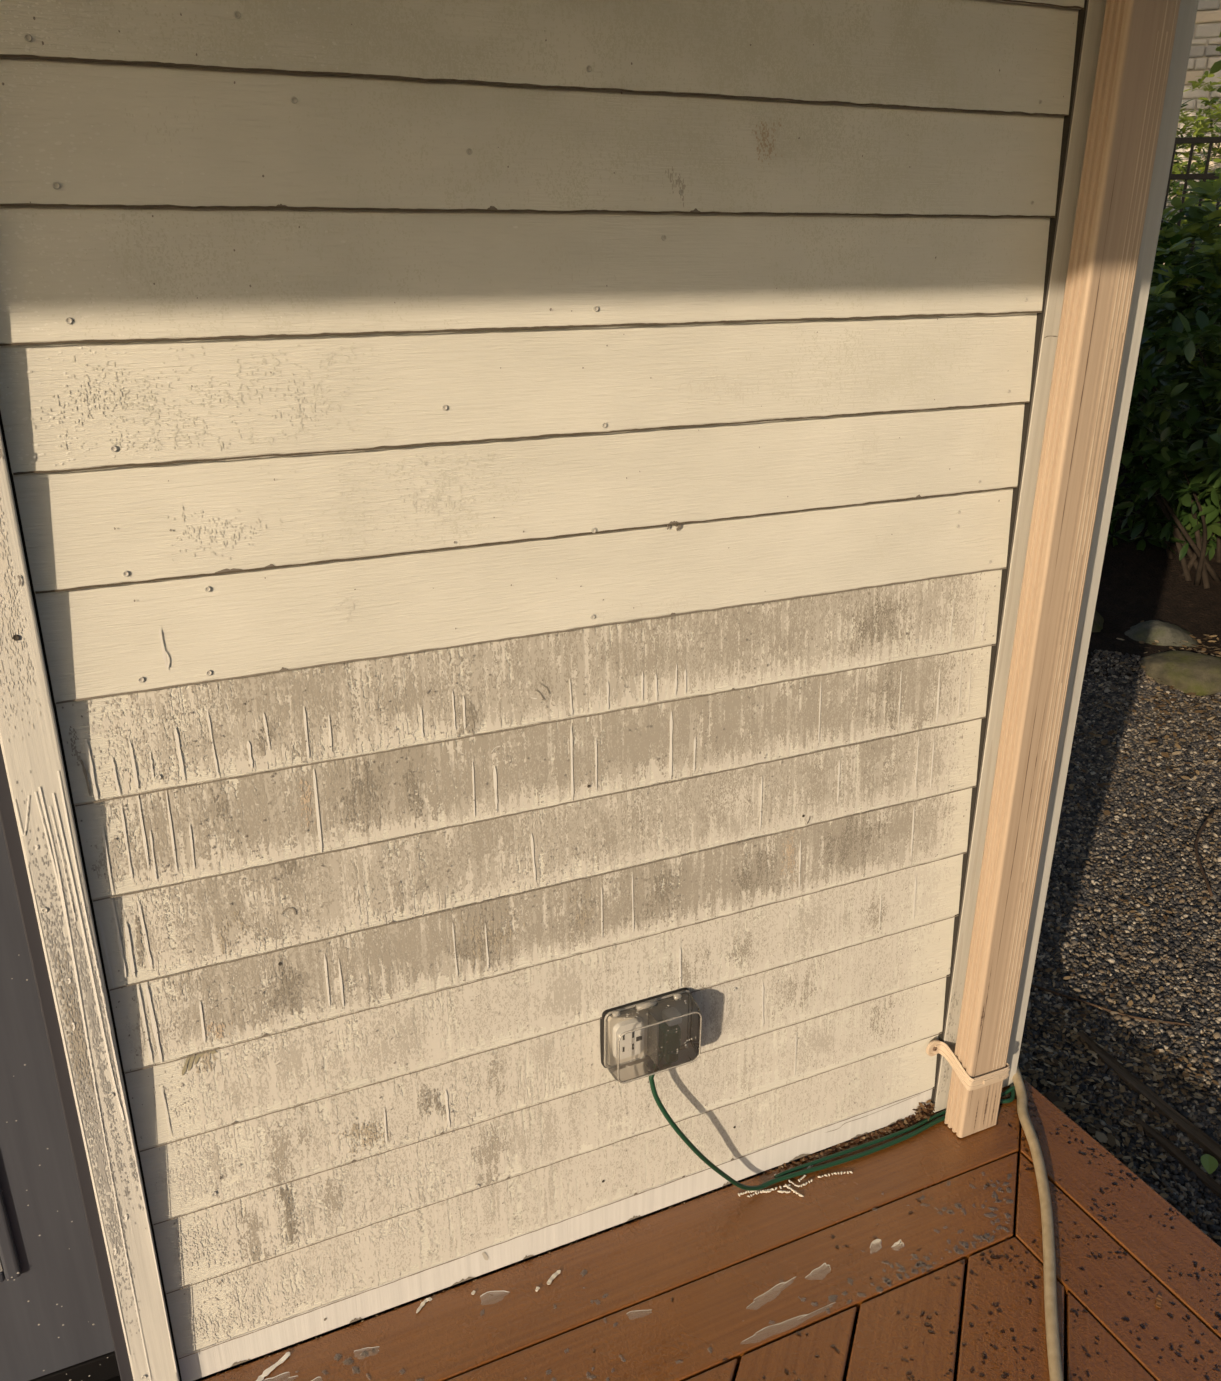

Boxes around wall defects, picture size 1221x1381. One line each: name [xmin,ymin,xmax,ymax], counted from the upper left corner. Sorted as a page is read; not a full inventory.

leakage [0,506,41,742]